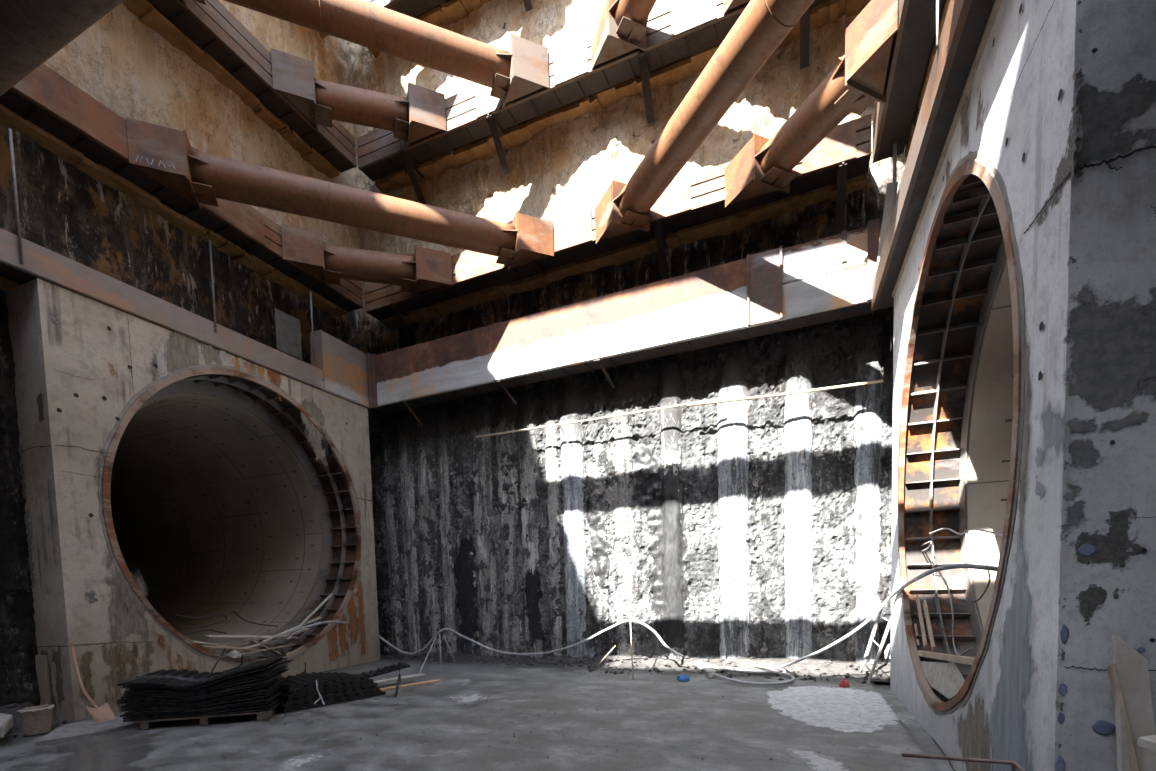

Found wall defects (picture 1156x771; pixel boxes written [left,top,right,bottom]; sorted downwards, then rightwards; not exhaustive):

crack [1023,145,1156,235]
corrosion [327,571,366,660]
damp [452,537,479,653]
damp [520,506,545,645]